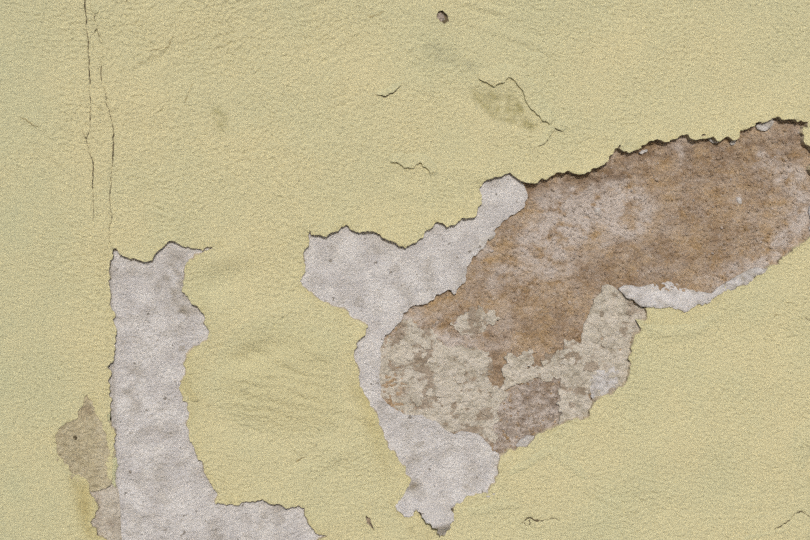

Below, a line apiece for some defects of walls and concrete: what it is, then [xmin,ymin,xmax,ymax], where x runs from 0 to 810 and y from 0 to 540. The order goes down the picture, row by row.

crack [83,0,114,244]
flaking render [55,241,325,540]
flaking render [300,118,810,536]